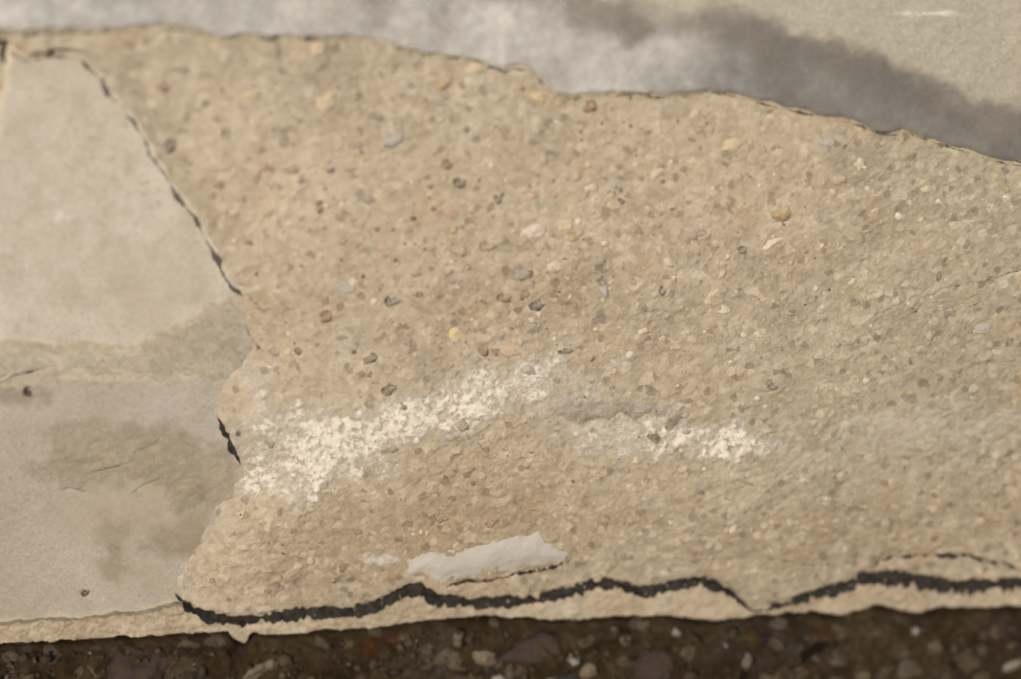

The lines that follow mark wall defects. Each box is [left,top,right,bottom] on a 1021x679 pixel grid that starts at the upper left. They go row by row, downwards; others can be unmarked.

crack [1,364,55,382]
damp [233,352,773,504]